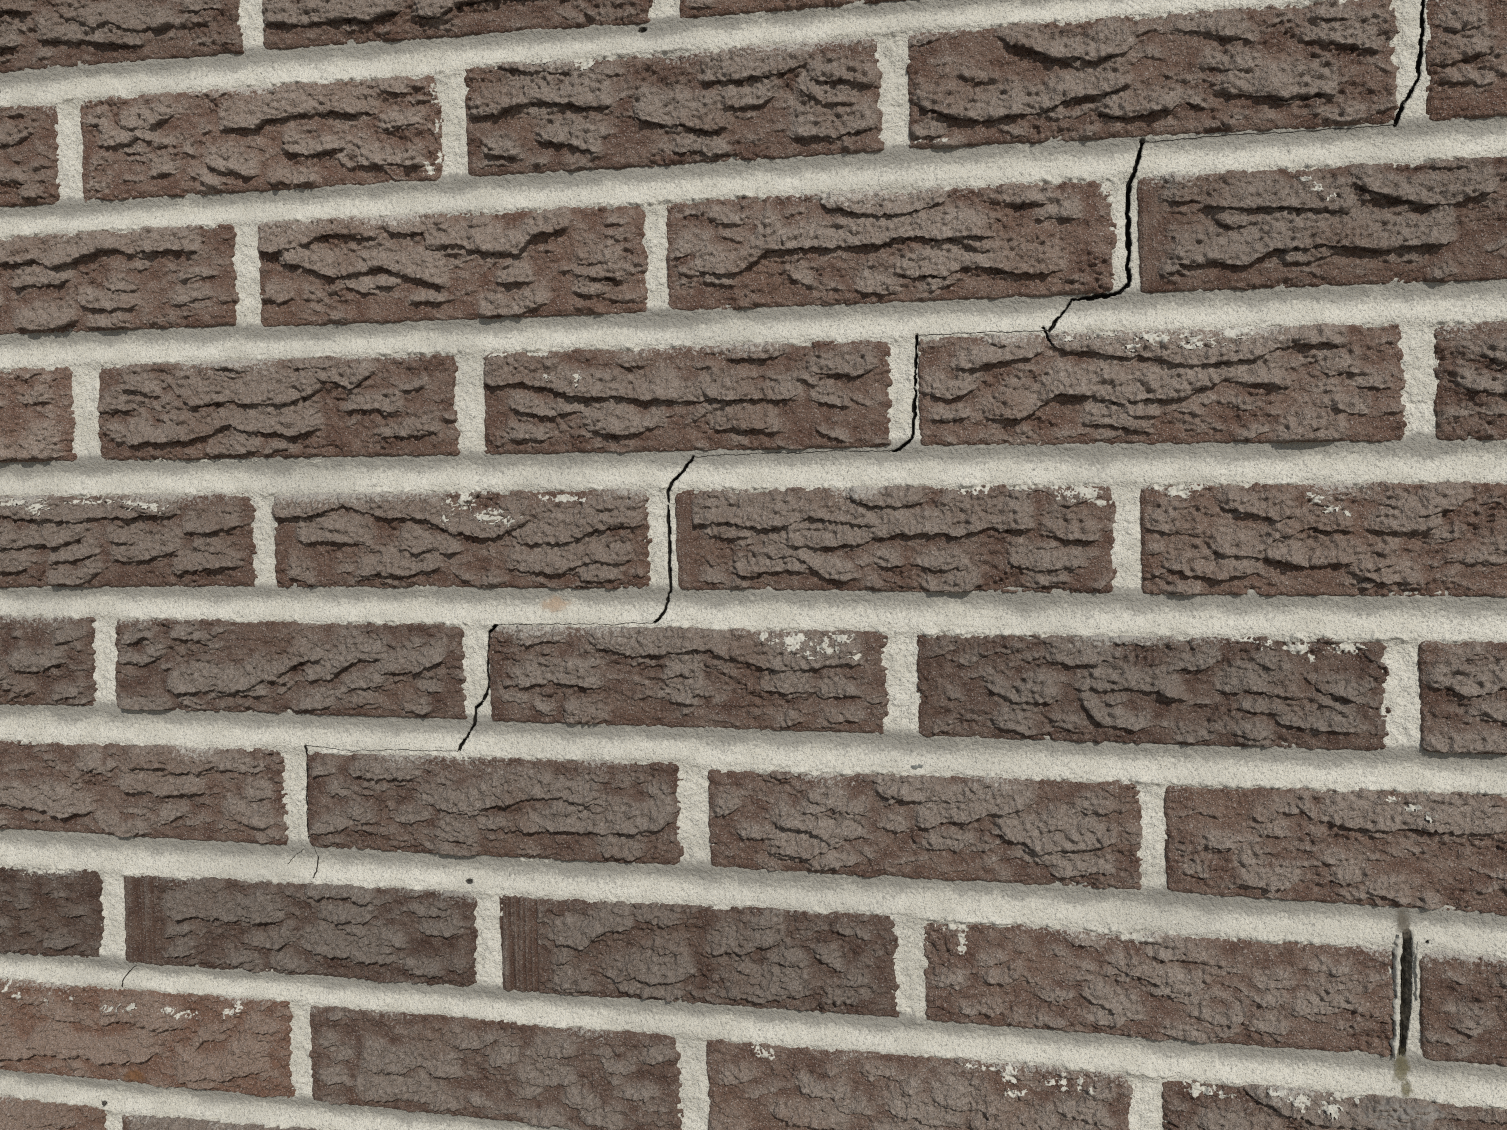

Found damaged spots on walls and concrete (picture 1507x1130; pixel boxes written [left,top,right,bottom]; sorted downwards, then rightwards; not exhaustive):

crack [288,0,1425,878]